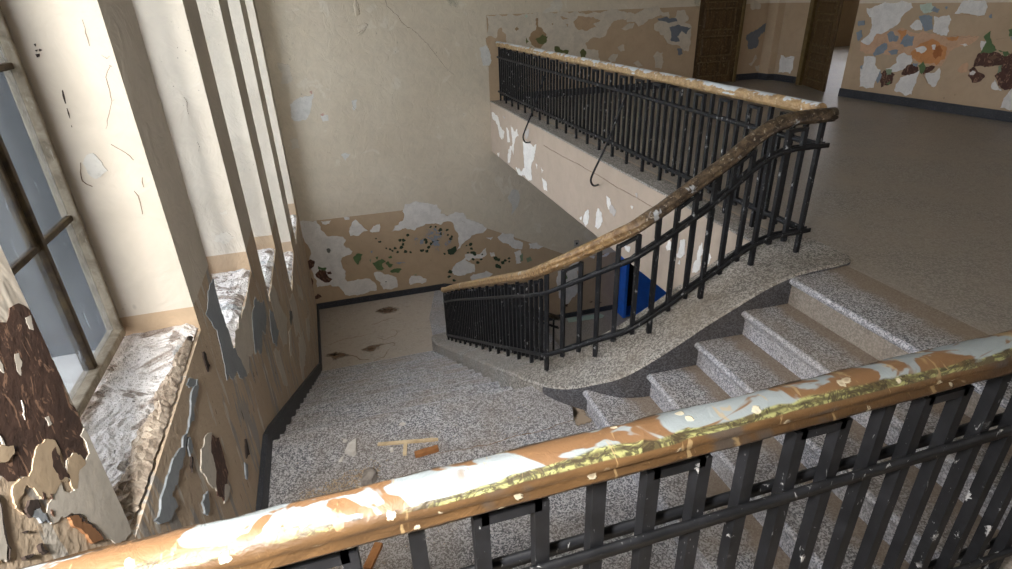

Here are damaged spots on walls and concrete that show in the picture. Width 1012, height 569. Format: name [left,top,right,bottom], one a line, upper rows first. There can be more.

peeling [480,5,692,69]
peeling [856,0,1012,110]
peeling [80,153,108,187]
crack [82,20,144,214]
peeling [290,91,329,122]
peeling [492,112,547,191]
peeling [580,196,616,229]
peeling [206,201,544,386]
peeling [0,303,230,544]
peeling [21,543,49,560]